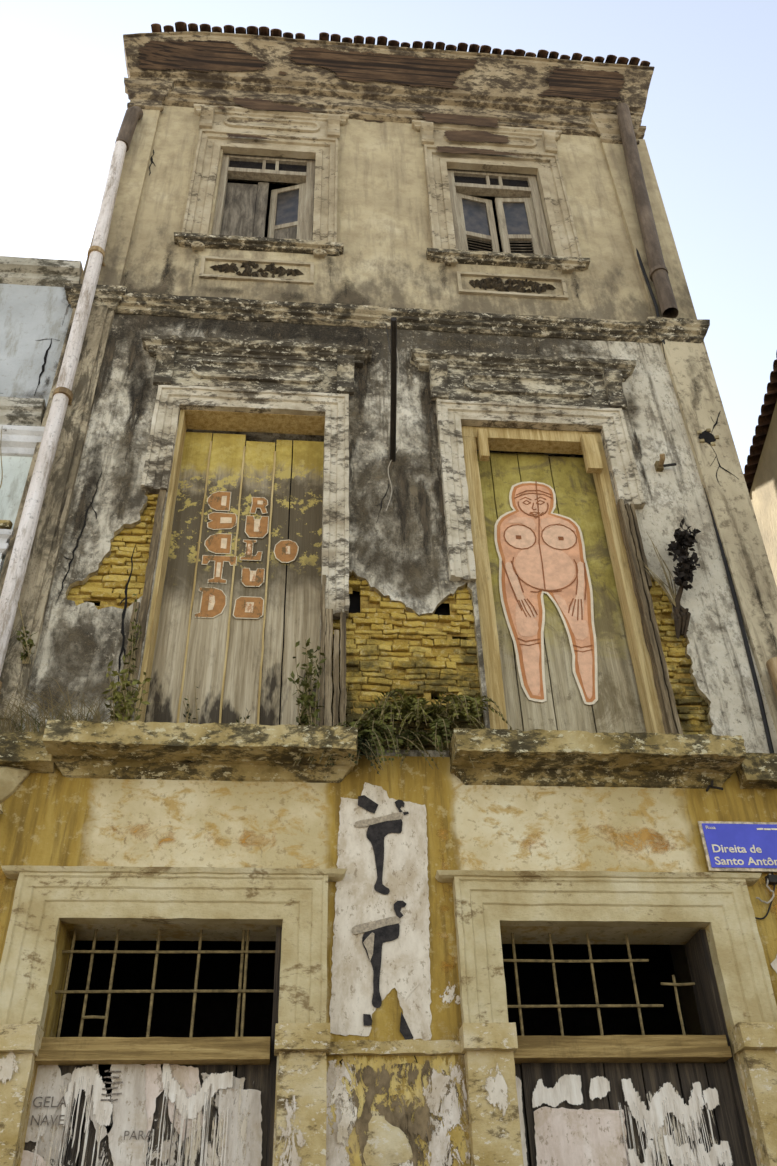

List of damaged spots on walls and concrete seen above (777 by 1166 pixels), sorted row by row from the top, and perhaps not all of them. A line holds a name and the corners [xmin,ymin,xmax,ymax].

damp [55,445,101,553]
flaking render [67,493,159,610]
damp [94,315,448,598]
crack [710,411,737,483]
damp [38,626,120,710]
flaking render [331,573,484,751]
flaking render [650,576,712,735]